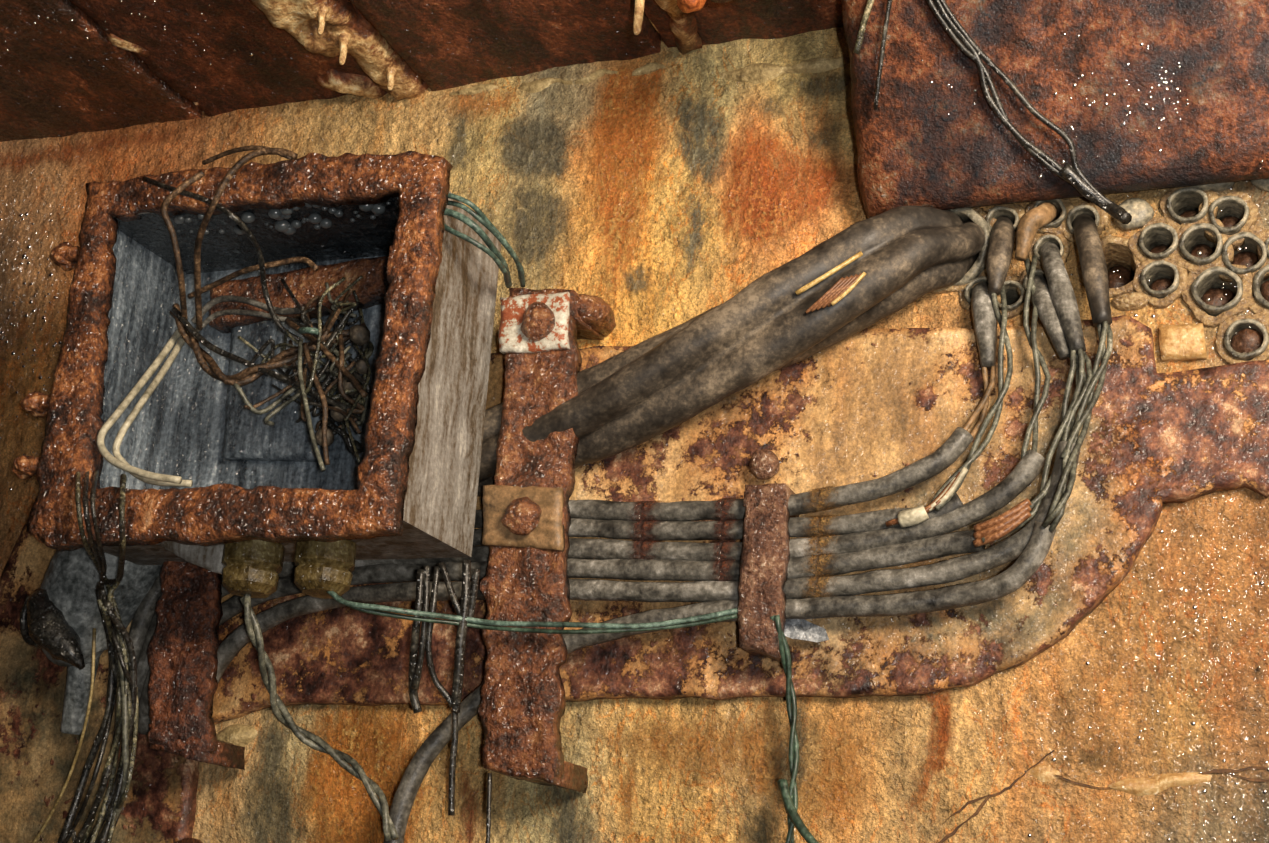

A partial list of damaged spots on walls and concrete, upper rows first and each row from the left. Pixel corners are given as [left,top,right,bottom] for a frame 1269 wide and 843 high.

leakage [449,62,666,97]
leakage [501,117,566,175]
leakage [513,189,563,263]
rust [597,69,662,289]
leakage [685,195,703,271]
leakage [677,101,724,180]
rust [726,134,837,245]
rust [631,501,657,560]
rust [806,486,834,598]
rust [914,692,950,804]
crack [938,750,1111,843]
crack [1198,766,1269,782]